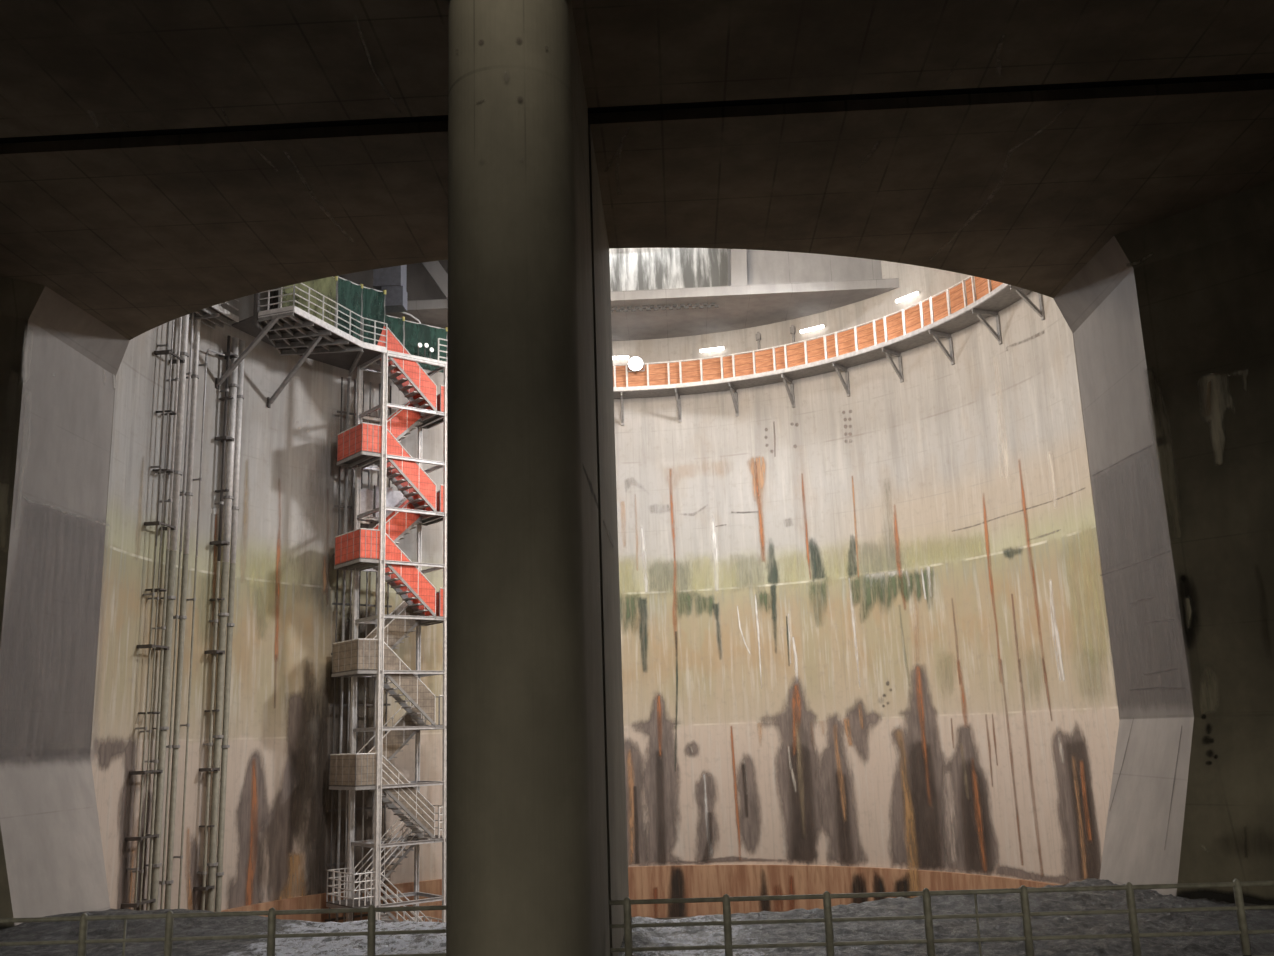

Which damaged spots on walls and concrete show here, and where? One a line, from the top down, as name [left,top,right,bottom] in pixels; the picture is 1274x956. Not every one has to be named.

water stain [1200,370,1248,464]
water stain [337,611,375,642]
rust [670,492,678,771]
rust [750,457,765,548]
rust [894,516,905,602]
rust [983,501,1002,665]
rust [1019,464,1030,550]
water stain [228,664,386,909]
water stain [624,616,1101,918]
rust [987,717,1023,865]